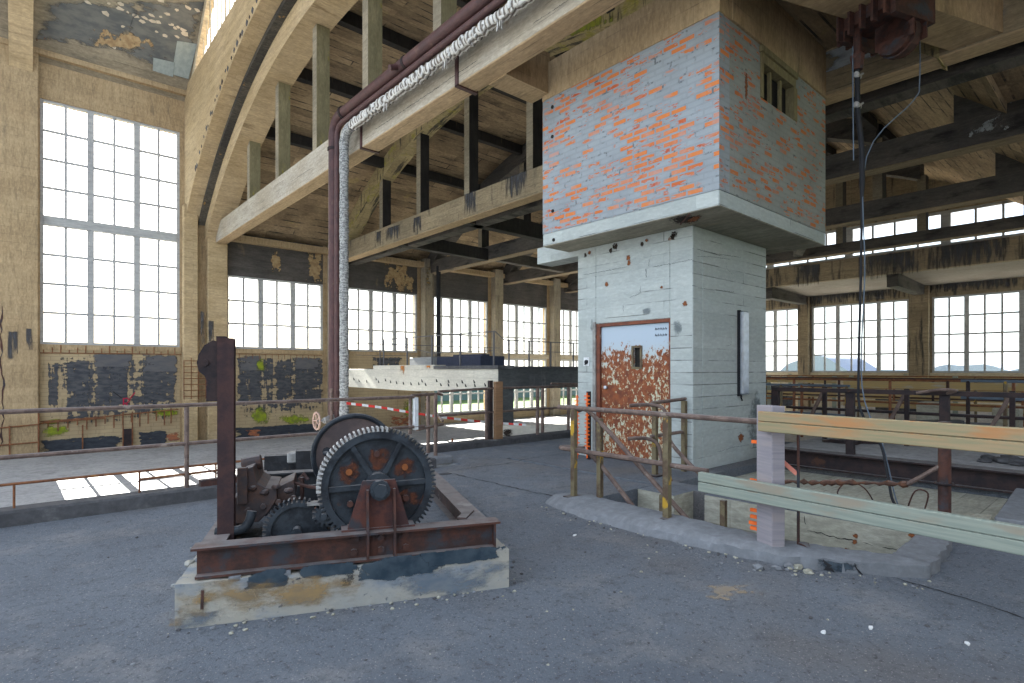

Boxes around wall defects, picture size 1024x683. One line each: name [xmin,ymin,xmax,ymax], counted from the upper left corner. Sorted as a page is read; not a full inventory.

peeling [36,0,204,64]
water stain [506,171,527,197]
water stain [464,190,476,213]
water stain [375,225,399,247]
water stain [932,237,1009,270]
water stain [794,250,919,304]
water stain [929,278,1017,292]
peeling [0,345,206,455]
peeling [236,354,323,438]